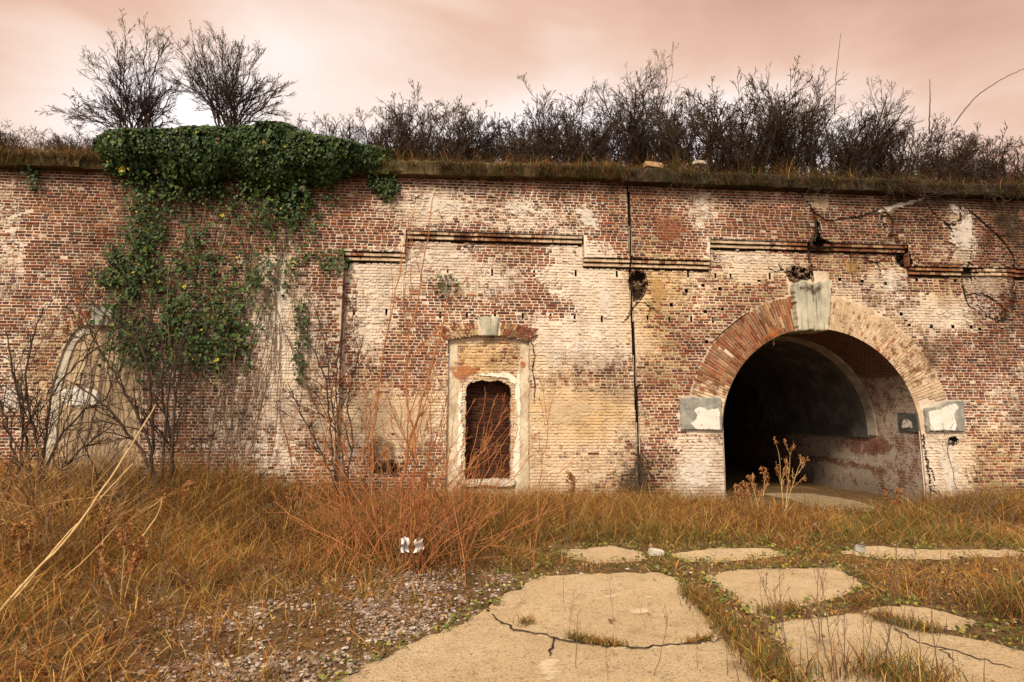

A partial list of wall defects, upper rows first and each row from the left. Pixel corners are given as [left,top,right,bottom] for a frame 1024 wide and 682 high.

spalling [564,254,649,317]
spalling [707,249,813,282]
crack [769,192,894,282]
spalling [949,204,973,250]
crack [914,199,1018,321]
spalling [692,407,720,430]
spalling [928,404,970,497]
crack [492,614,728,656]
crack [894,629,1011,668]